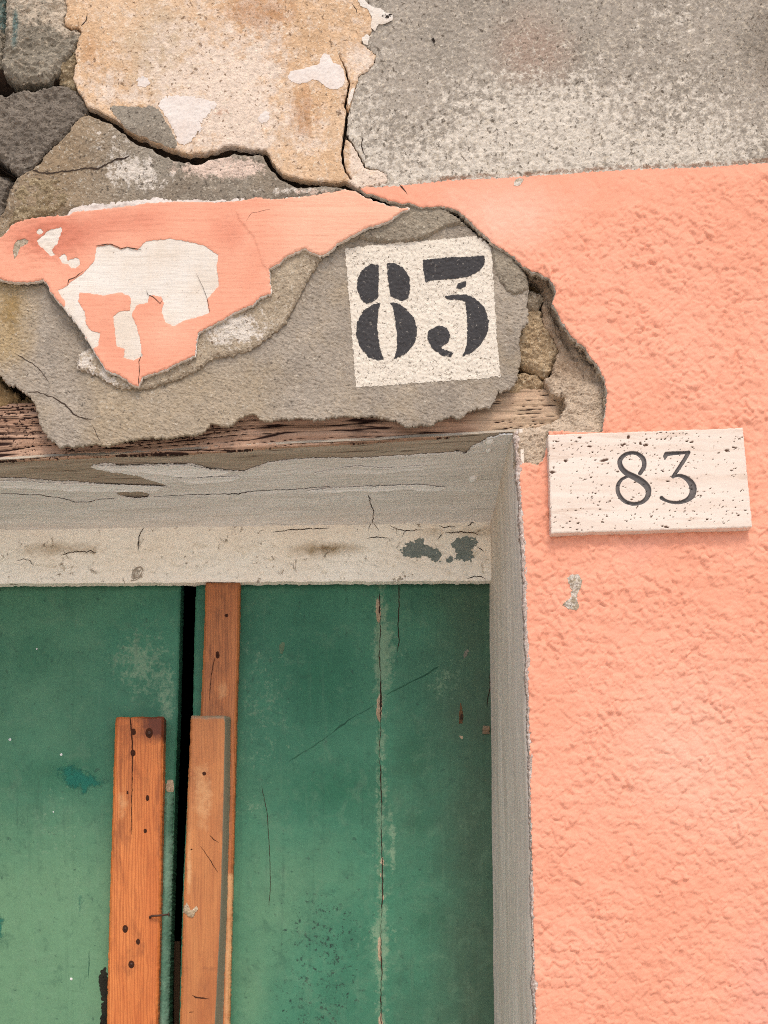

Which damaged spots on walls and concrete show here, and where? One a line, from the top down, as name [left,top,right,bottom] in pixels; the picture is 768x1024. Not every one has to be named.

peeling [358,0,393,45]
crack [0,69,16,97]
peeling [288,53,355,105]
peeling [110,95,217,148]
crack [0,74,407,205]
spalling [0,204,607,1024]